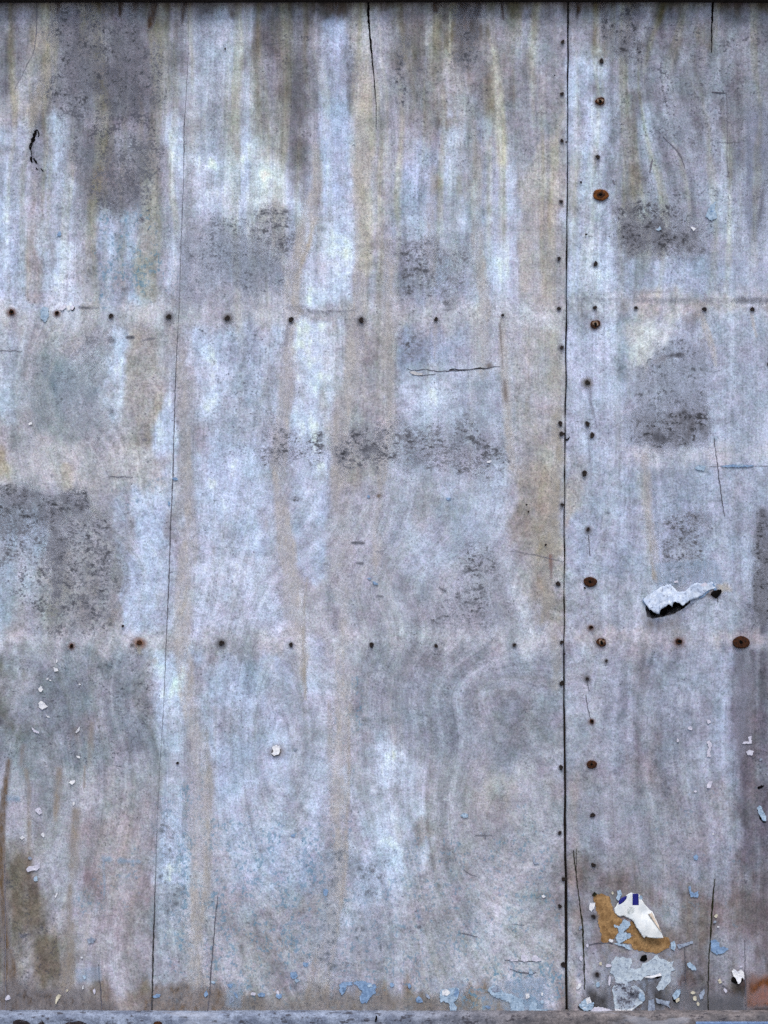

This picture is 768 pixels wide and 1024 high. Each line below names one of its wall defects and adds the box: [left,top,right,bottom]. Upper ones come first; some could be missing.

leakage [30,2,163,123]
crack [367,2,377,129]
crack [29,129,43,171]
leakage [615,200,705,256]
crack [407,366,500,376]
leakage [629,338,710,460]
leakage [0,483,129,637]
peeling [642,580,730,619]
peeling [339,981,377,1003]
peeling [485,985,547,1011]
crack [573,849,613,989]
peeling [576,919,705,1011]